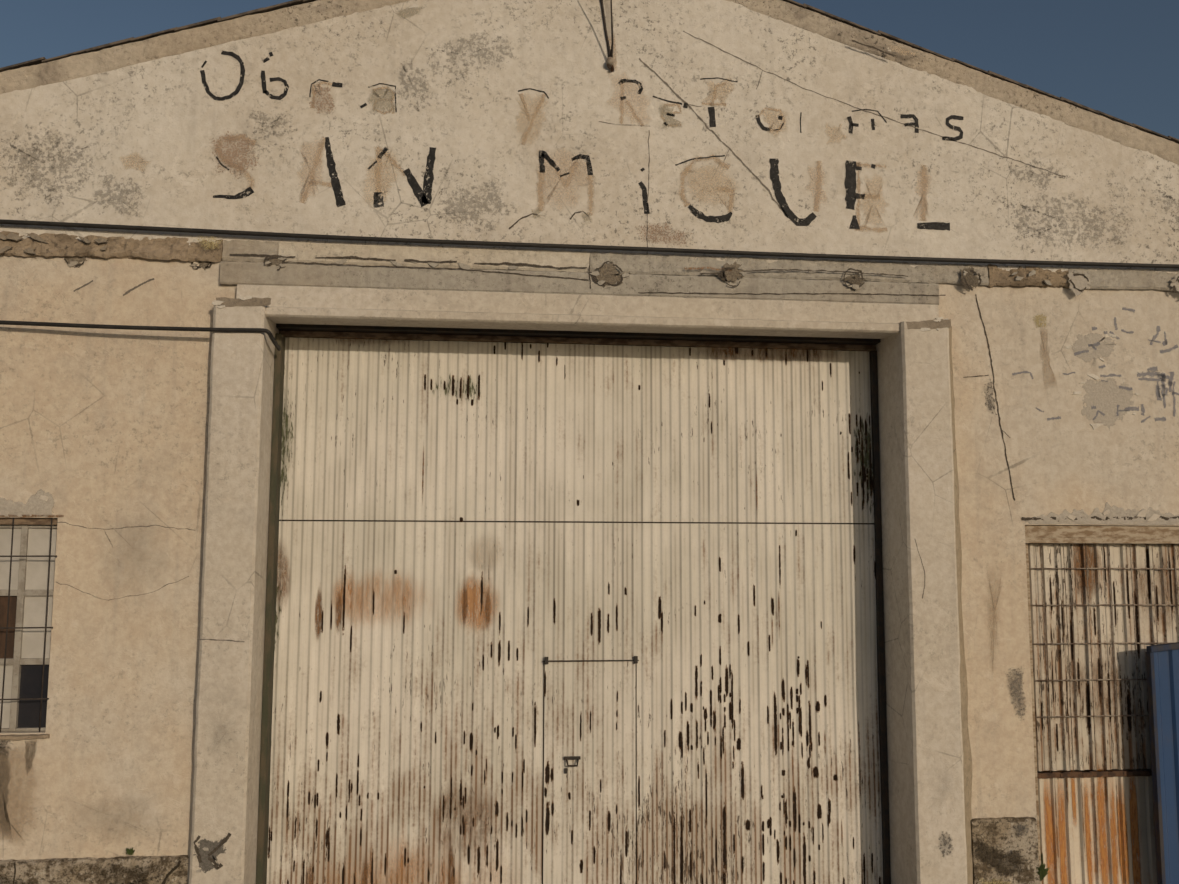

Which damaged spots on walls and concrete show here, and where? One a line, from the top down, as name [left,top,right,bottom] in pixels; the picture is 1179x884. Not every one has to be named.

spalling [0,231,223,269]
crack [963,294,1179,522]
spalling [0,489,54,517]
crack [56,522,192,543]
spalling [1026,502,1179,525]
corrosion [336,584,361,627]
corrosion [460,584,492,626]
corrosion [1075,543,1173,658]
corrosion [1041,572,1132,751]
water stain [25,742,36,768]
water stain [0,740,12,831]
corrosion [1044,770,1141,884]